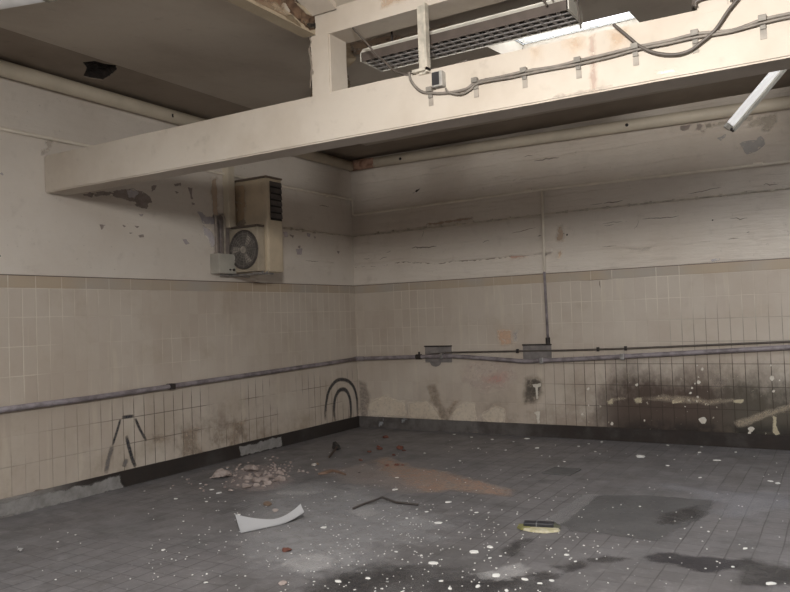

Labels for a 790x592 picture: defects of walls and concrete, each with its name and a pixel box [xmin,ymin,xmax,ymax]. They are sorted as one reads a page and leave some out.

spalling [255,0,316,30]
peeling [83,185,156,216]